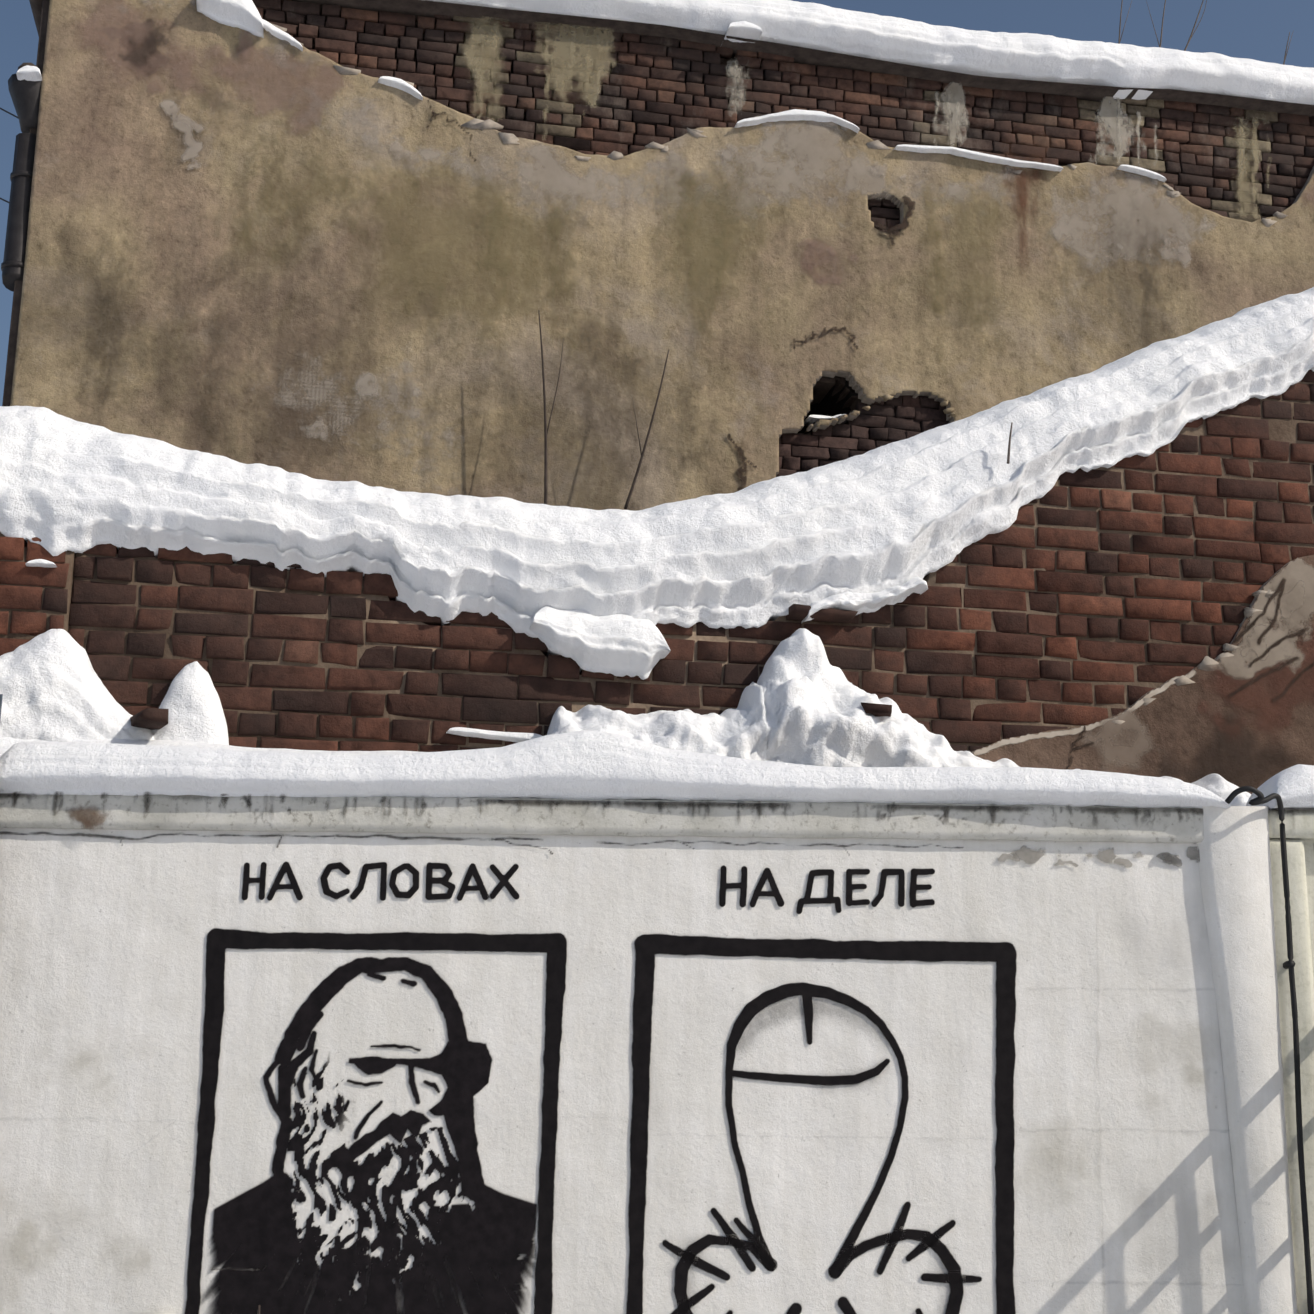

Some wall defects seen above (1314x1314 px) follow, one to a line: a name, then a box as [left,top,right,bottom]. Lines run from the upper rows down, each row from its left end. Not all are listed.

spalling [252,0,1314,266]
crack [793,327,858,349]
crack [727,434,757,490]
spalling [776,377,956,477]